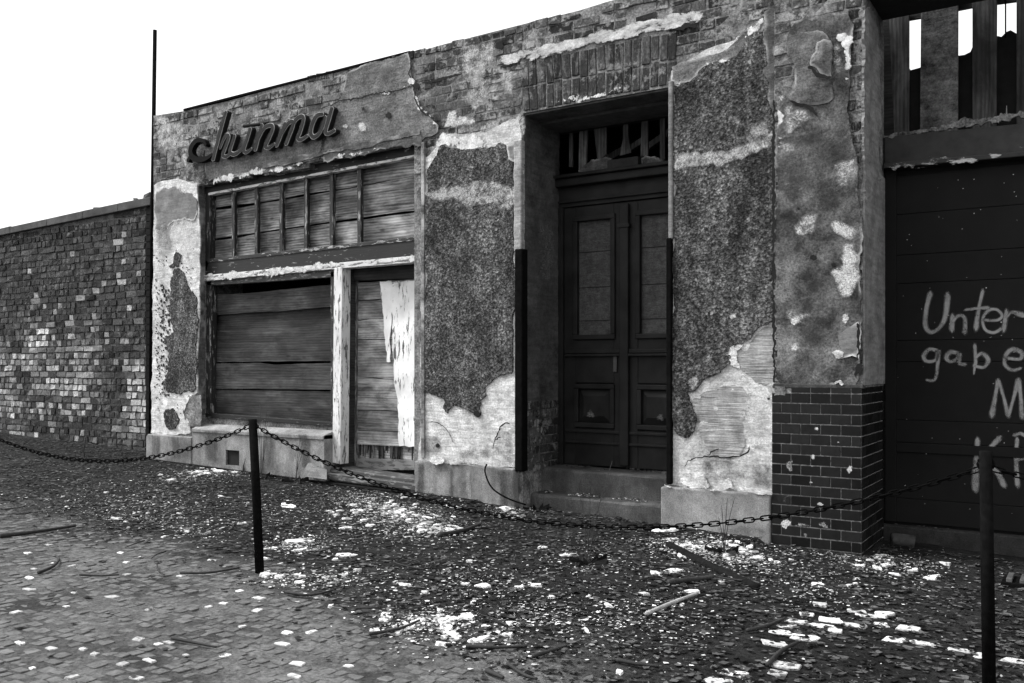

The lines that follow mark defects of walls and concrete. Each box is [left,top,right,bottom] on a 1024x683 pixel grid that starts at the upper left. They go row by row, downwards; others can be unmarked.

peeling [495,11,703,68]
flaking render [672,18,764,84]
flaking render [558,87,621,103]
peeling [213,162,303,183]
flaking render [154,248,202,430]
peeling [380,280,414,447]
flaking render [692,325,774,458]
flaking render [680,473,735,489]
crack [685,446,750,466]